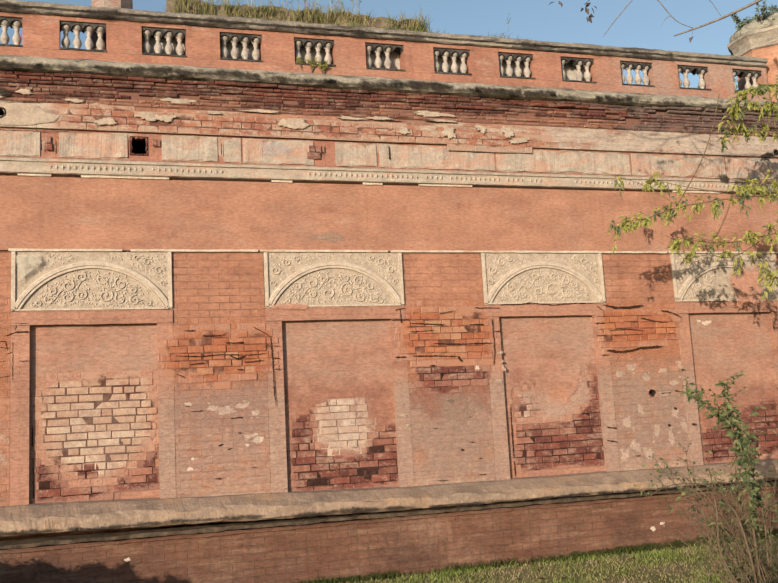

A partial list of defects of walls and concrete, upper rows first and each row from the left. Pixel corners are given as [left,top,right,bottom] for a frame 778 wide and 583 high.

spalling [0,88,559,159]
crack [0,310,29,378]
flaking render [29,323,280,503]
crack [176,327,280,407]
spalling [286,397,399,492]
spalling [394,300,605,471]
spalling [592,302,778,465]